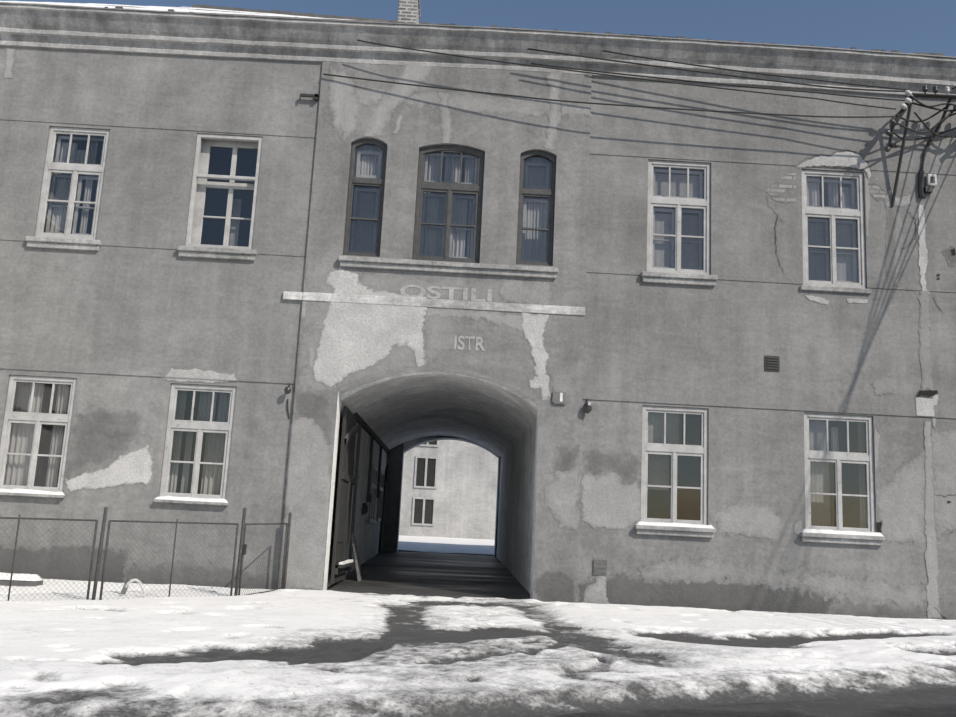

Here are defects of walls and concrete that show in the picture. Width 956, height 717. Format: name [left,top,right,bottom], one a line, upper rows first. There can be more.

flaking render [291,263,507,404]
flaking render [521,312,574,401]
flaking render [64,444,155,492]